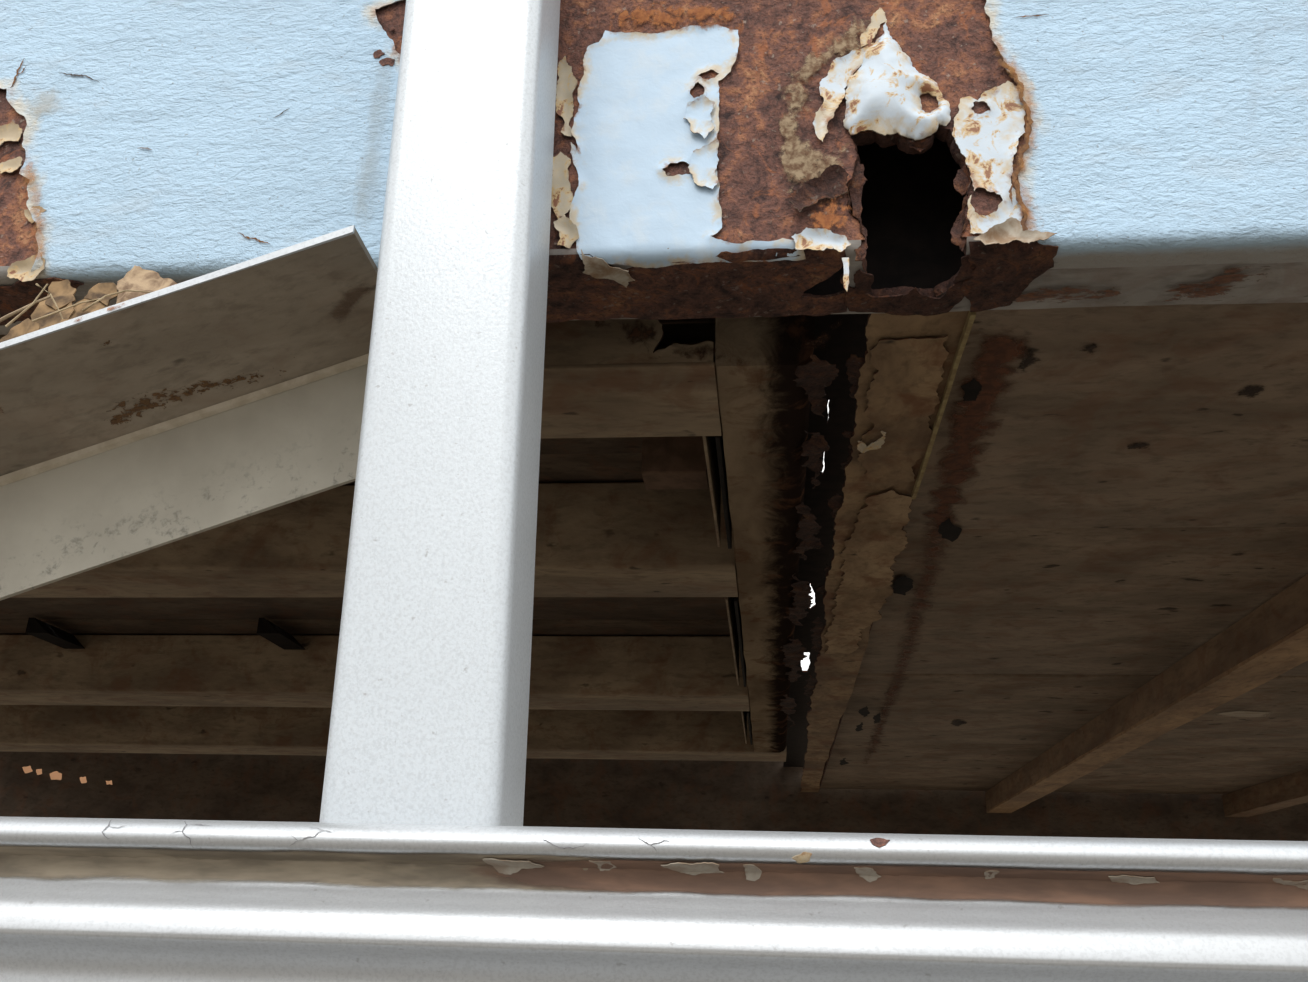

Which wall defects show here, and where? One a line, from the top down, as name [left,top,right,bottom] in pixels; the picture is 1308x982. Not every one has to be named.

corrosion [0,89,84,326]
peeling [551,24,851,291]
peeling [779,21,866,211]
corrosion [546,0,1121,347]
peeling [952,81,1057,245]
corrosion [104,370,263,425]
corrosion [840,336,1040,766]
peeling [792,852,812,864]